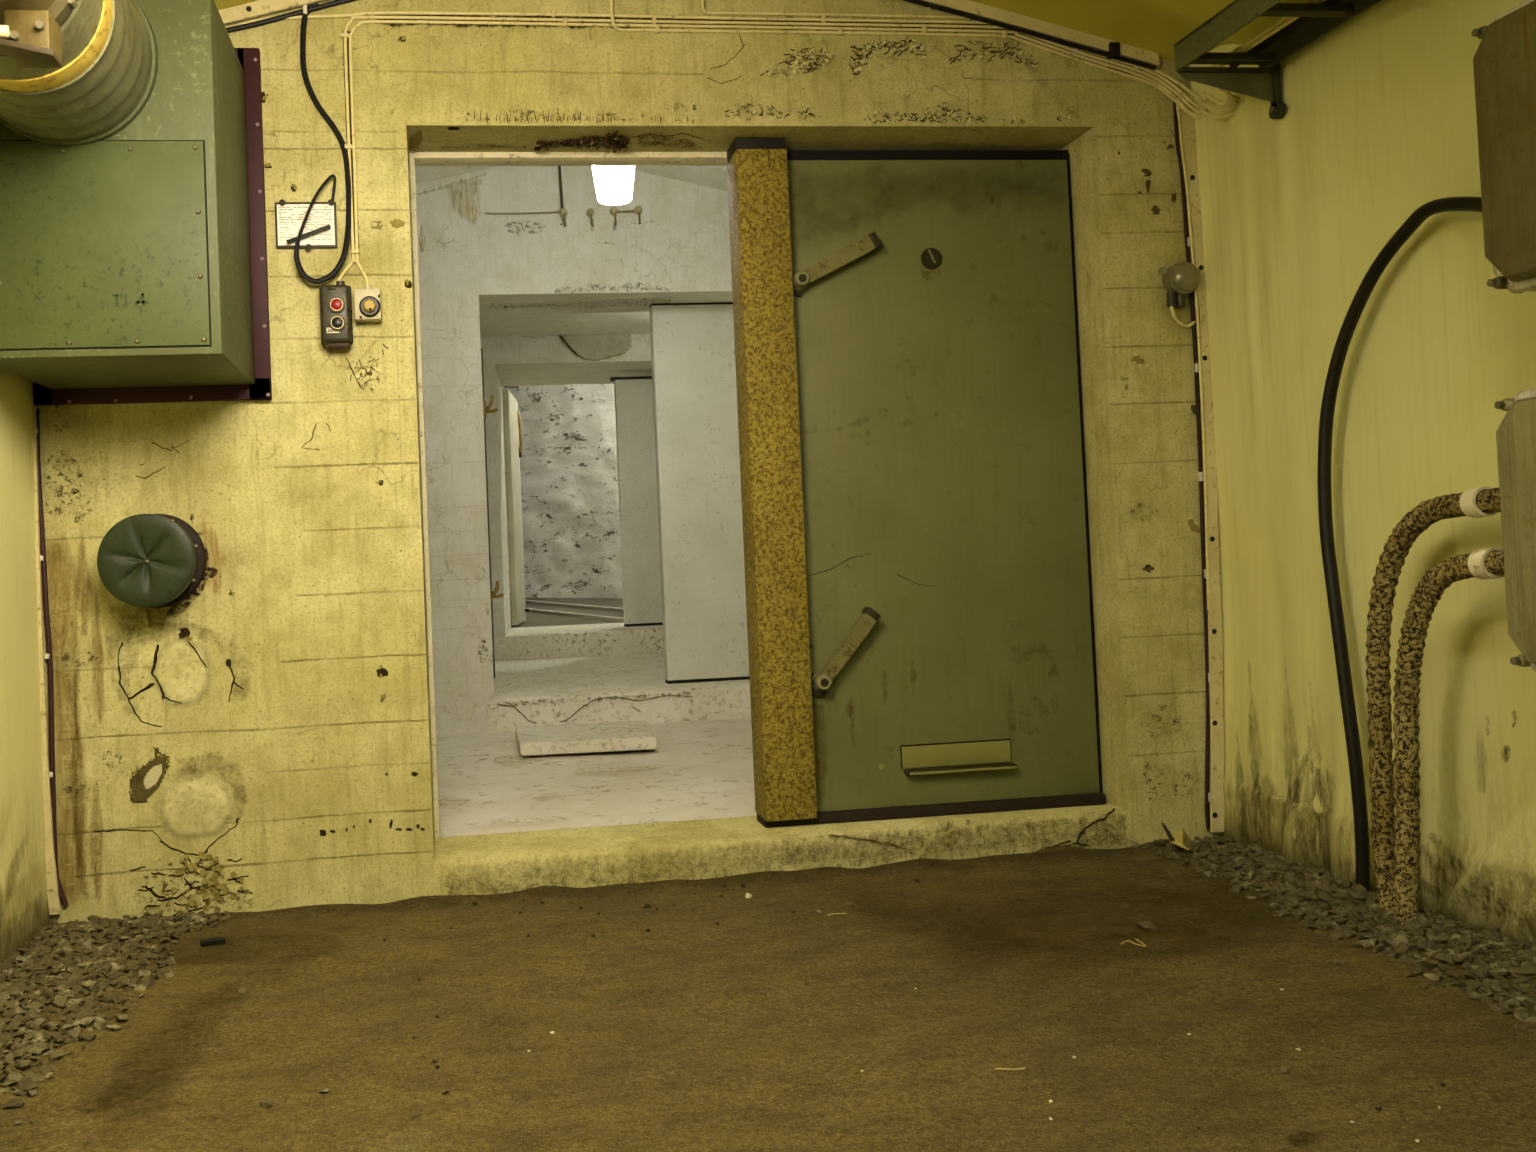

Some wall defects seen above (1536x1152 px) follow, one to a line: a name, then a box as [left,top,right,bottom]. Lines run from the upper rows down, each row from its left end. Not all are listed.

crack [118,642,244,727]
water stain [48,553,101,895]
spalling [128,747,171,804]
crack [94,824,238,899]
crack [829,834,908,850]
crack [1052,808,1115,848]